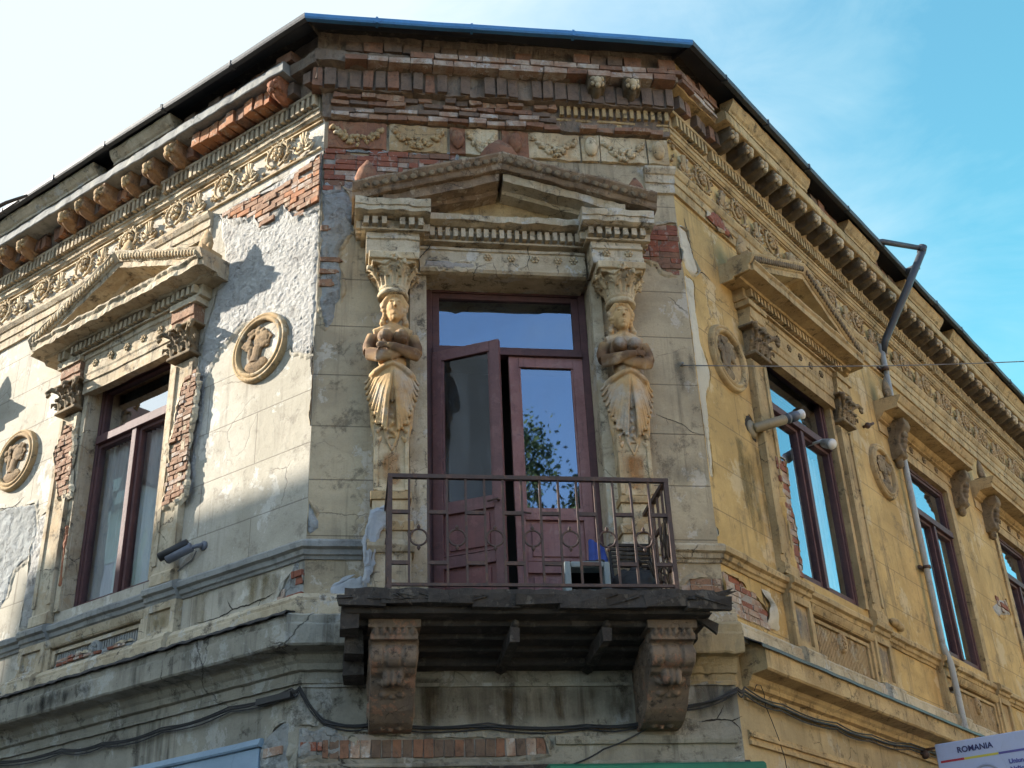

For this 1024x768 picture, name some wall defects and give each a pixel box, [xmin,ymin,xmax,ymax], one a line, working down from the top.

spalling [161,148,459,512]
flaking render [643,220,715,482]
spalling [0,499,46,631]
flaking render [52,421,79,502]
crack [198,594,272,623]
peeling [330,505,386,594]
flaking render [679,570,771,631]
flaking render [775,456,804,580]